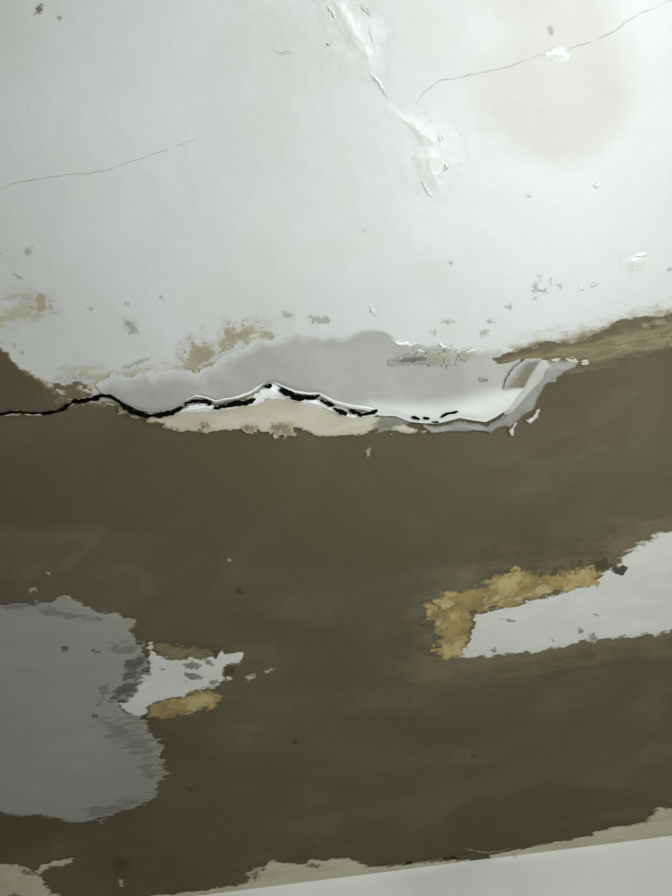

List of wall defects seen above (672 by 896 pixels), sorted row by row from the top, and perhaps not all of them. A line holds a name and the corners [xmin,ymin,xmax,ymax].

crack [418,0,672,101]
leakage [446,0,672,177]
crack [0,135,206,190]
peeling [531,274,564,300]
crack [0,384,378,419]
crack [412,411,459,423]
spalling [0,295,672,896]